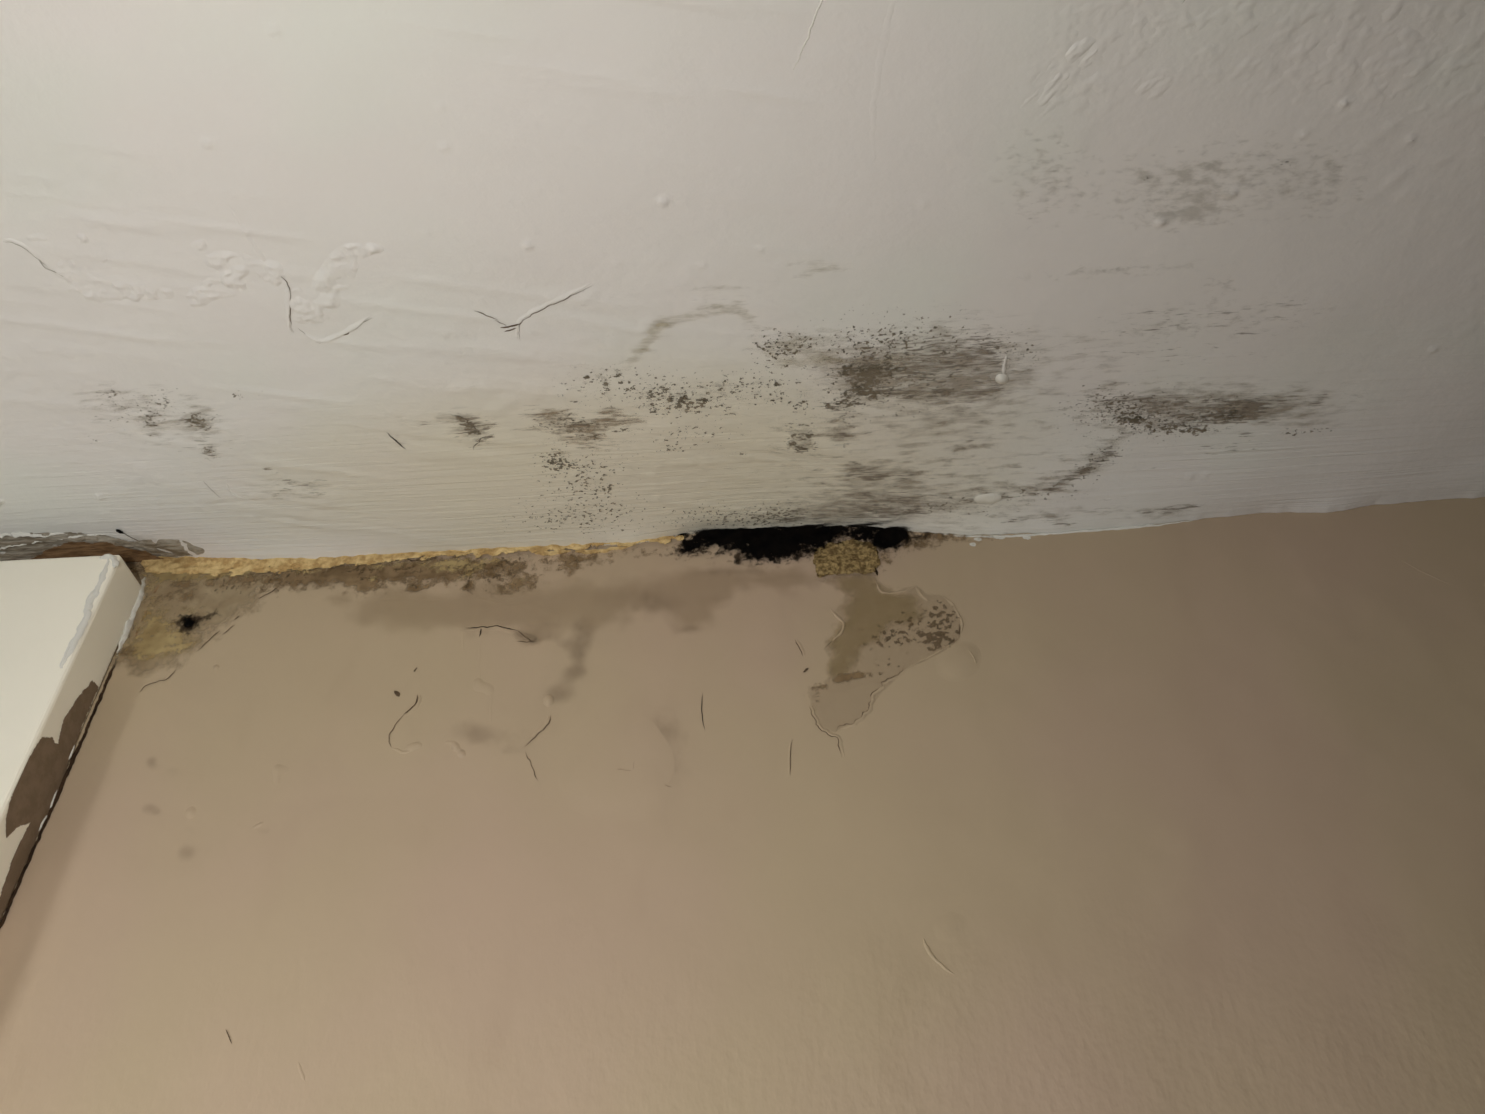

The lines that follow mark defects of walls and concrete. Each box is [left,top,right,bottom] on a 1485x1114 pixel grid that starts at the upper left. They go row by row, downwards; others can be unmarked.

crack [476,283,591,340]
leakage [455,415,495,447]
leakage [506,312,1041,539]
spalling [803,539,964,689]
spalling [903,533,966,548]
leakage [663,383,1332,564]
peeling [0,681,98,919]